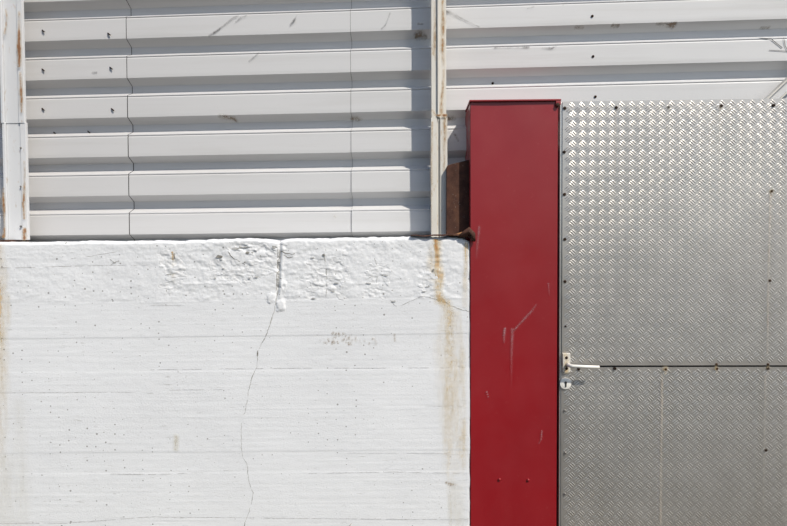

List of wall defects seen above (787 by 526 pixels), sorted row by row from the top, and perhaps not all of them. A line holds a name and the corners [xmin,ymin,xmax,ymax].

crack [241,249,295,526]
rust [434,239,445,304]